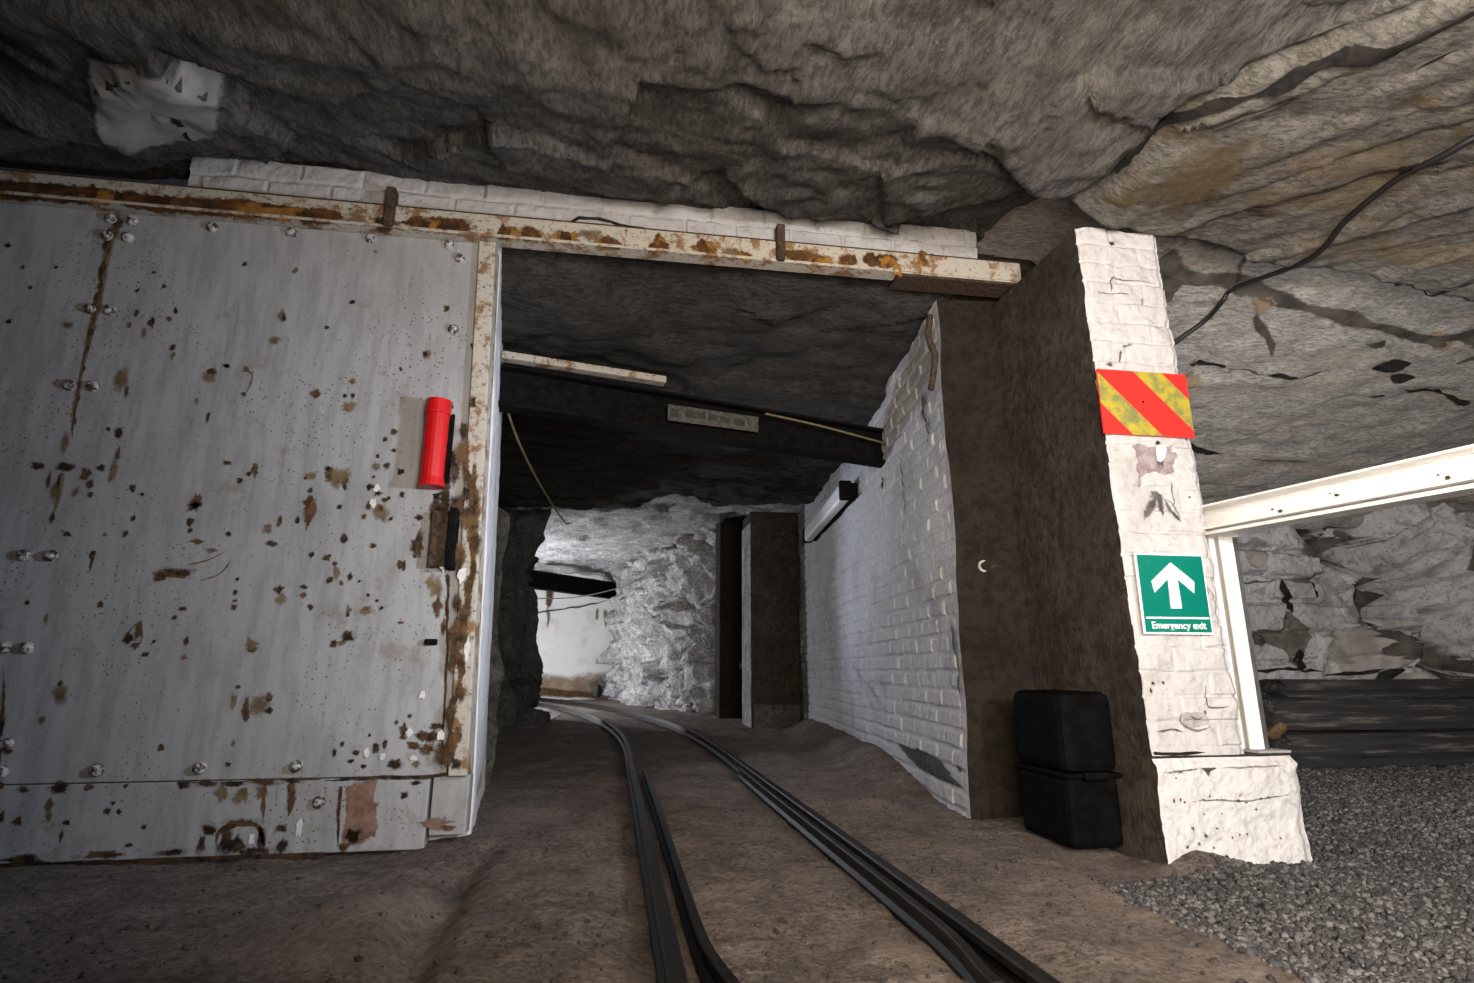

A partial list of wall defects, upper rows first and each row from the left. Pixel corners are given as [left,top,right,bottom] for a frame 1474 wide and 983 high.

rust [649,234,669,253]
rust [690,238,752,263]
rust [785,250,927,277]
rust [154,494,239,611]
rust [309,533,384,647]
rust [398,451,456,571]
rust [0,574,450,868]
rust [420,818,456,831]